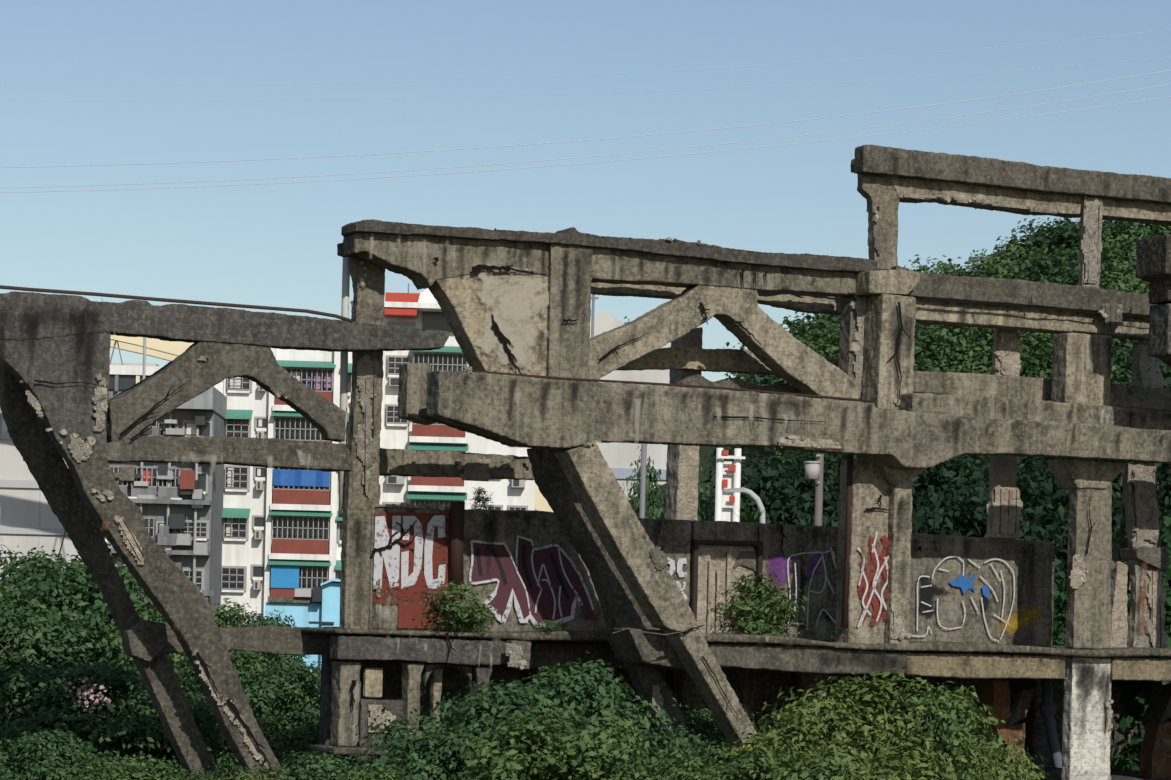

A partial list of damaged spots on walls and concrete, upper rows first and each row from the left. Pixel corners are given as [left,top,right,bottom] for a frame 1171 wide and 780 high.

crack [491,314,522,374]
crack [886,296,1149,401]
spalling [19,373,108,462]
spalling [90,488,114,502]
spalling [113,515,144,565]
spalling [1069,554,1089,589]
spalling [192,650,274,780]
crack [671,625,741,721]